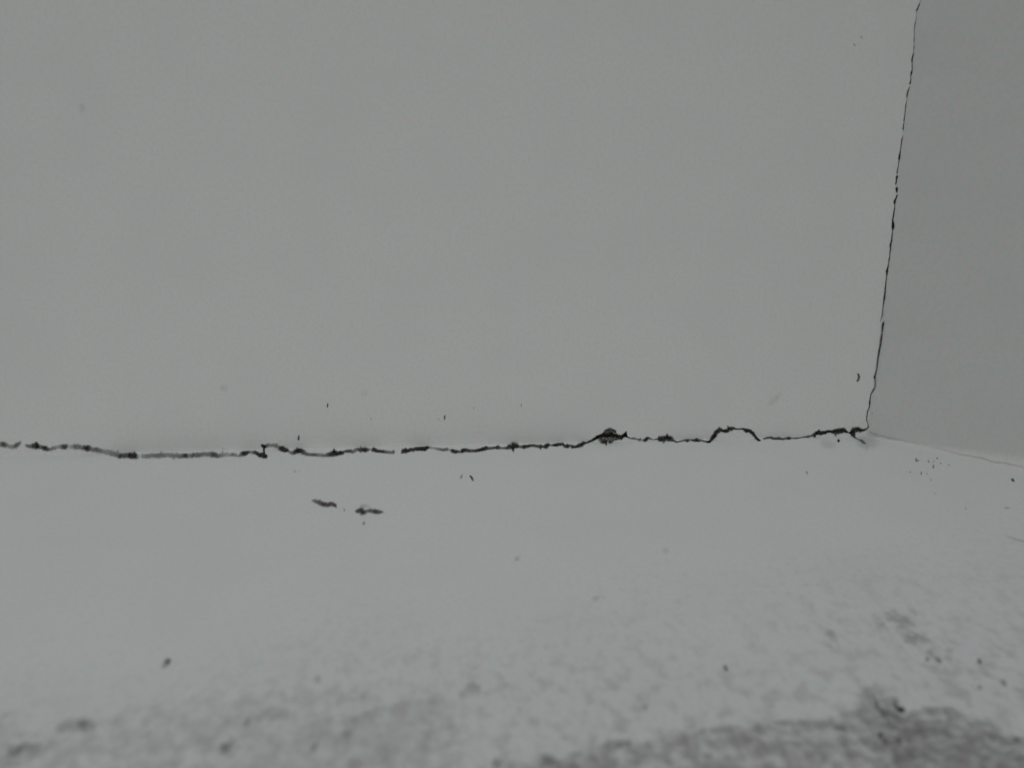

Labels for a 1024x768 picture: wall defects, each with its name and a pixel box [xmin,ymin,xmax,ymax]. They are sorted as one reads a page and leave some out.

crack [628,3,920,443]
crack [1,437,599,458]